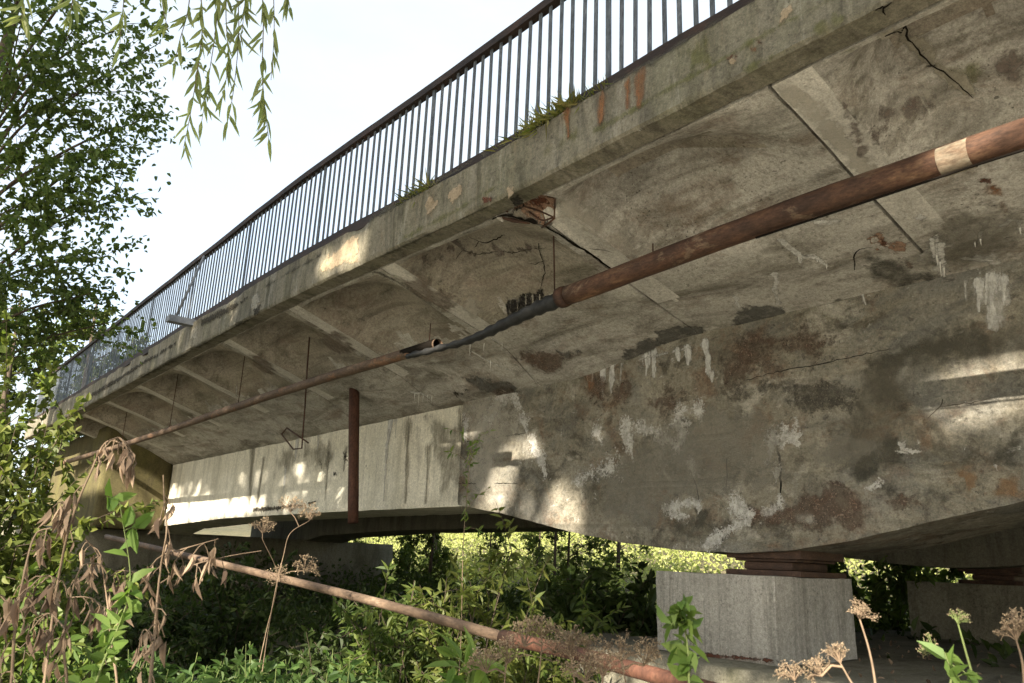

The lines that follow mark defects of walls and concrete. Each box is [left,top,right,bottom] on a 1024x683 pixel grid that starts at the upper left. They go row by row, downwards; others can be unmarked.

crack [875,2,973,98]
spalling [495,187,556,228]
crack [456,213,612,286]
water stain [592,363,622,393]
water stain [642,338,714,382]
crack [747,349,889,380]
water stain [834,213,1024,500]